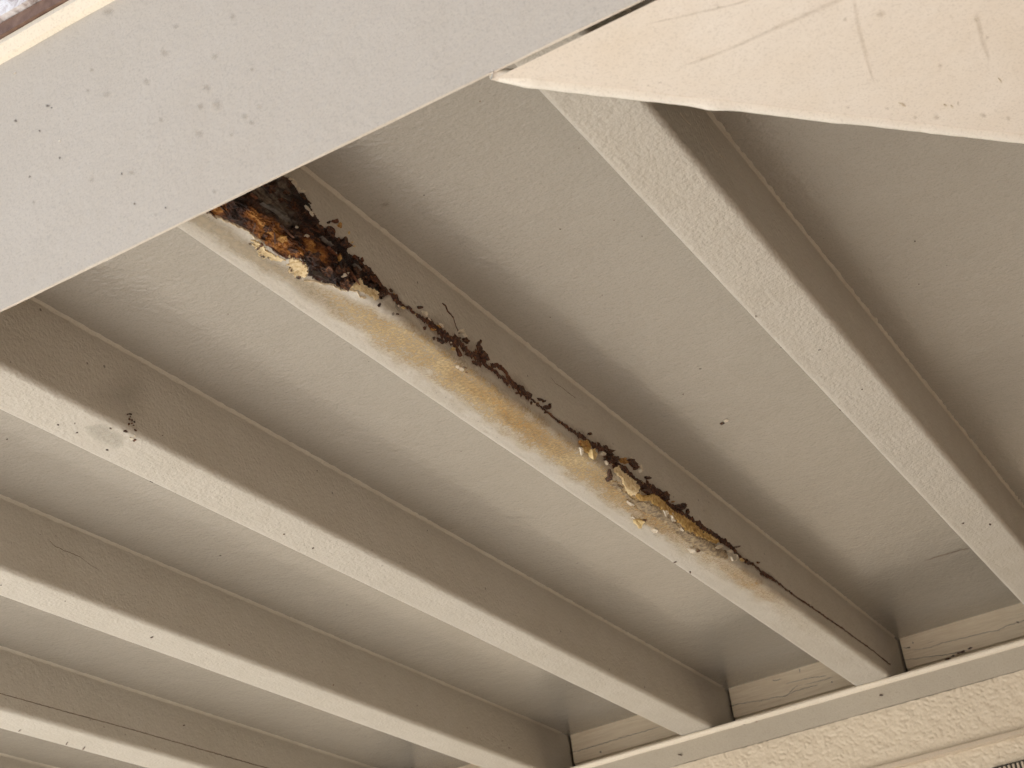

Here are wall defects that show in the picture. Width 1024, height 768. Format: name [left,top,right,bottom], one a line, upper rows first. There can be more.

rust [191,215,290,279]
rust [318,292,686,542]
peeling [578,432,760,565]